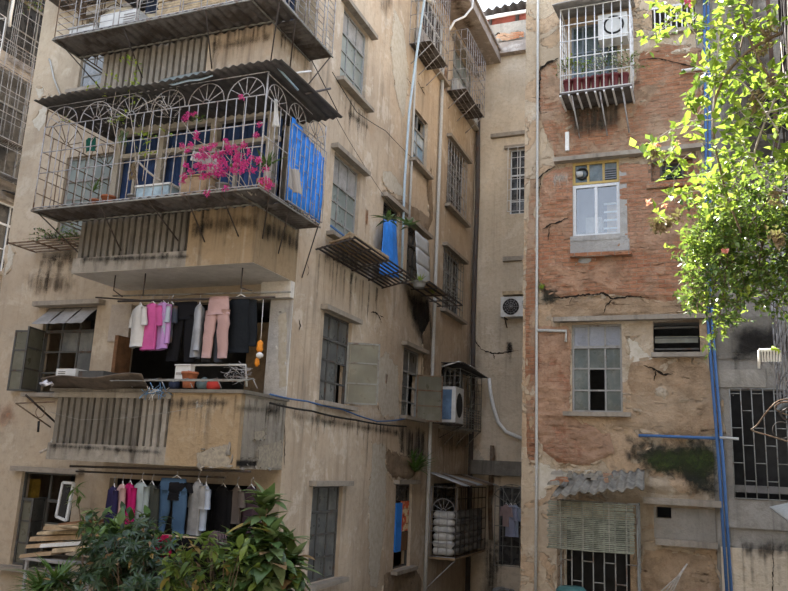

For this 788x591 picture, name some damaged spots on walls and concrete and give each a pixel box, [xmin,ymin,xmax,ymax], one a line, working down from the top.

crack [539,58,558,111]
water stain [36,273,63,290]
crack [541,292,649,312]
peeling [521,42,726,500]
crack [643,365,673,380]
spalling [196,428,283,471]
water stain [627,437,717,498]